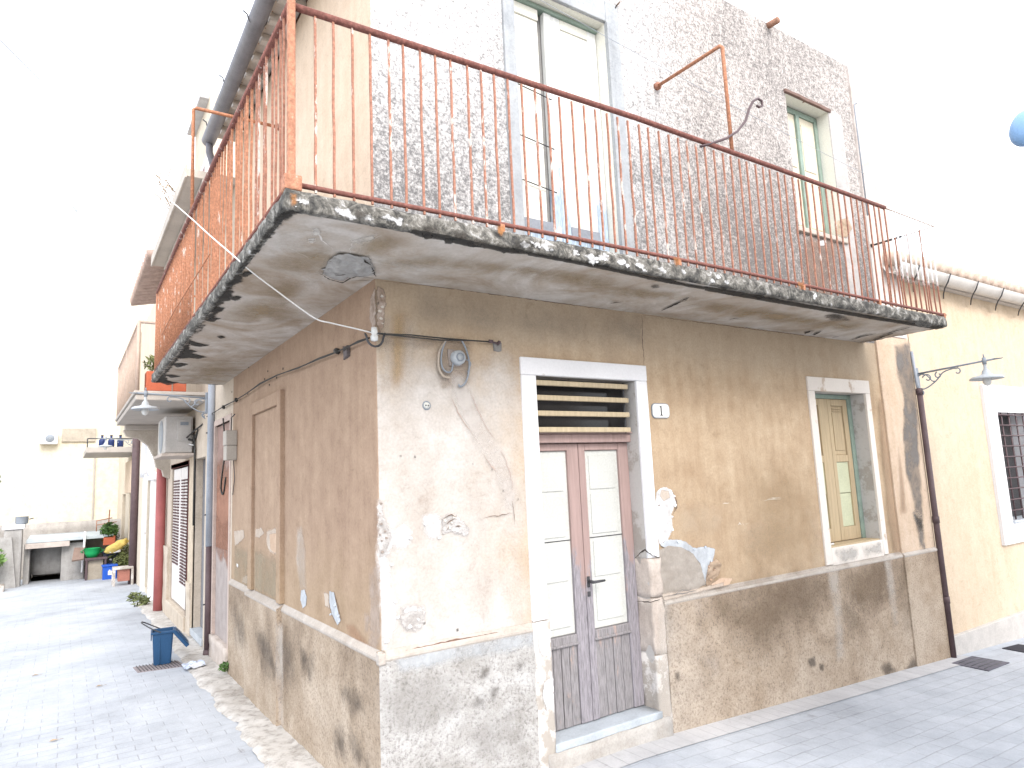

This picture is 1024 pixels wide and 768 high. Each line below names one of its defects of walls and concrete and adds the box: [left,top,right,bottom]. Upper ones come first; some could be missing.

damp [155,210,297,385]
spalling [321,254,386,331]
damp [880,345,925,548]
peeling [216,517,276,583]
flaking render [423,514,469,539]
peeling [656,487,722,586]